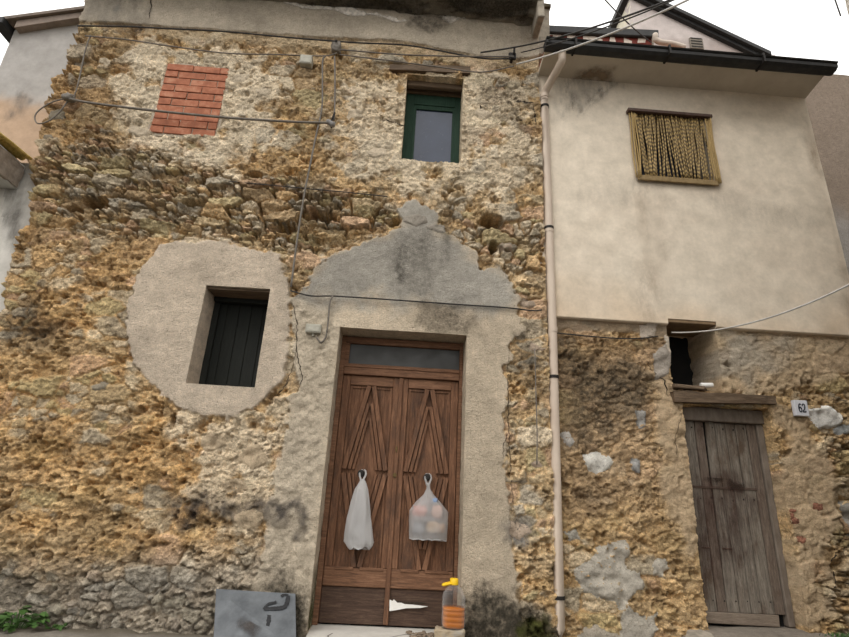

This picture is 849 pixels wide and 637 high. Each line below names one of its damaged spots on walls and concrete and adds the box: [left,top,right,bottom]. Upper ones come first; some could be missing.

leakage [309,0,425,24]
leakage [439,0,533,23]
leakage [578,69,610,81]
leakage [463,583,558,637]